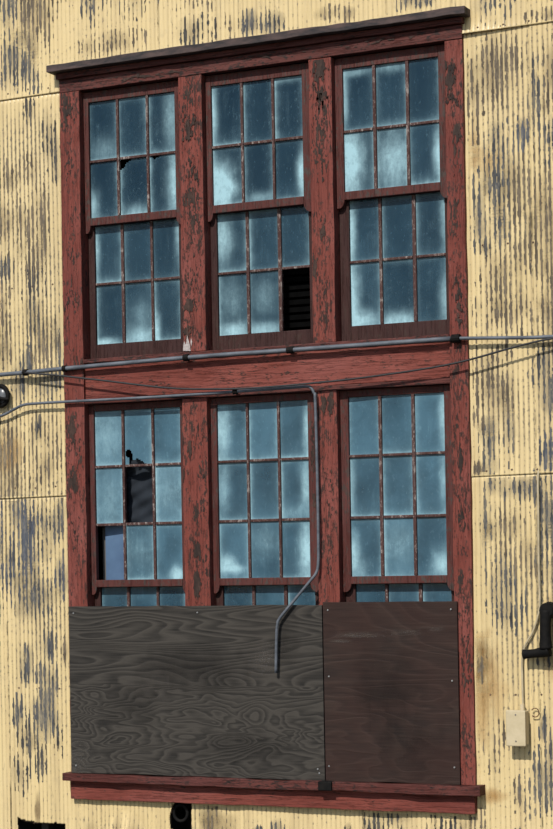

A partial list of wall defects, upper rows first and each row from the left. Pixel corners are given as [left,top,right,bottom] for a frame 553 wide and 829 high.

peeling [172,0,285,45]
peeling [309,59,331,183]
peeling [179,80,204,313]
peeling [183,325,202,351]
peeling [445,0,553,637]
peeling [0,0,147,797]
peeling [310,421,332,513]
peeling [193,539,208,599]
peeling [462,635,484,697]
peeling [483,719,506,775]